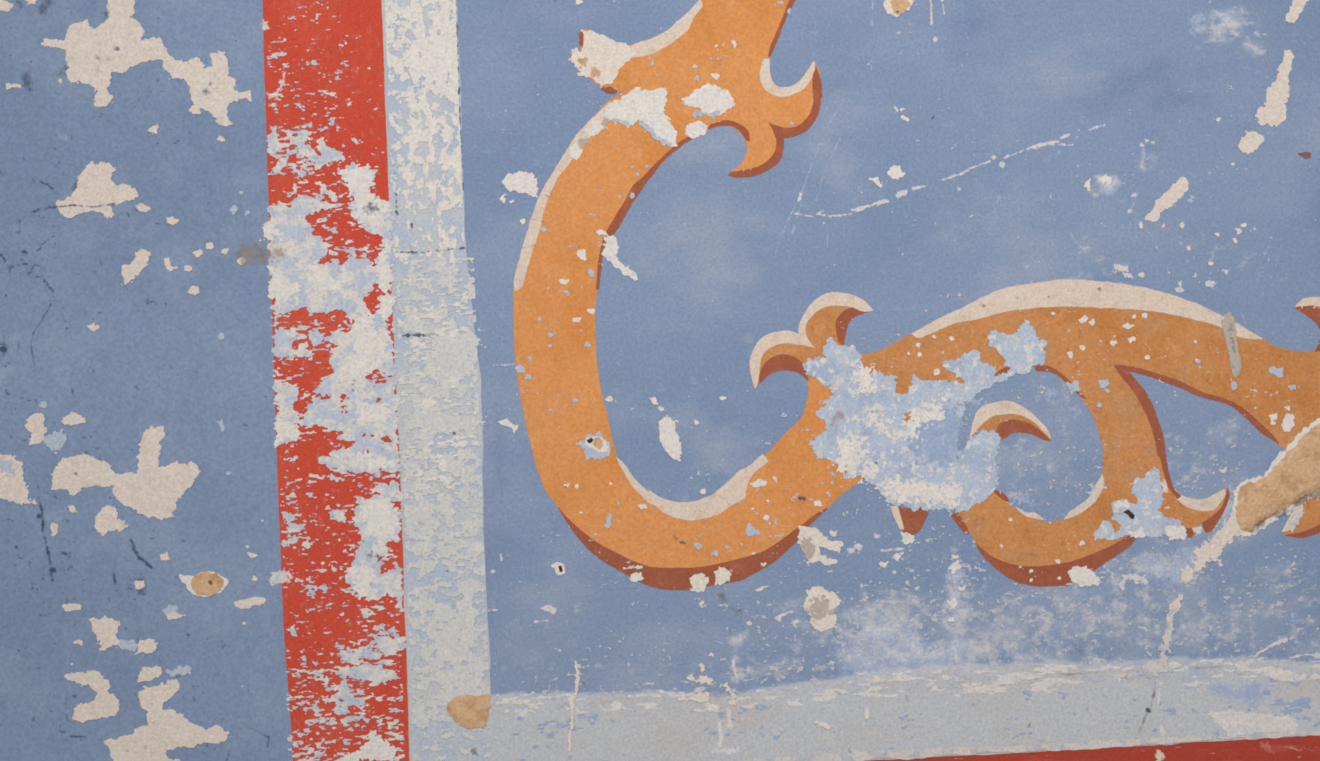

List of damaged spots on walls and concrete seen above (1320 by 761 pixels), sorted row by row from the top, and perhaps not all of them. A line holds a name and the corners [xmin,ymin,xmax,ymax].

peeling [41,0,252,142]
peeling [568,0,745,160]
peeling [1230,358,1299,432]
peeling [0,454,37,505]
peeling [25,401,201,536]
peeling [60,603,232,761]